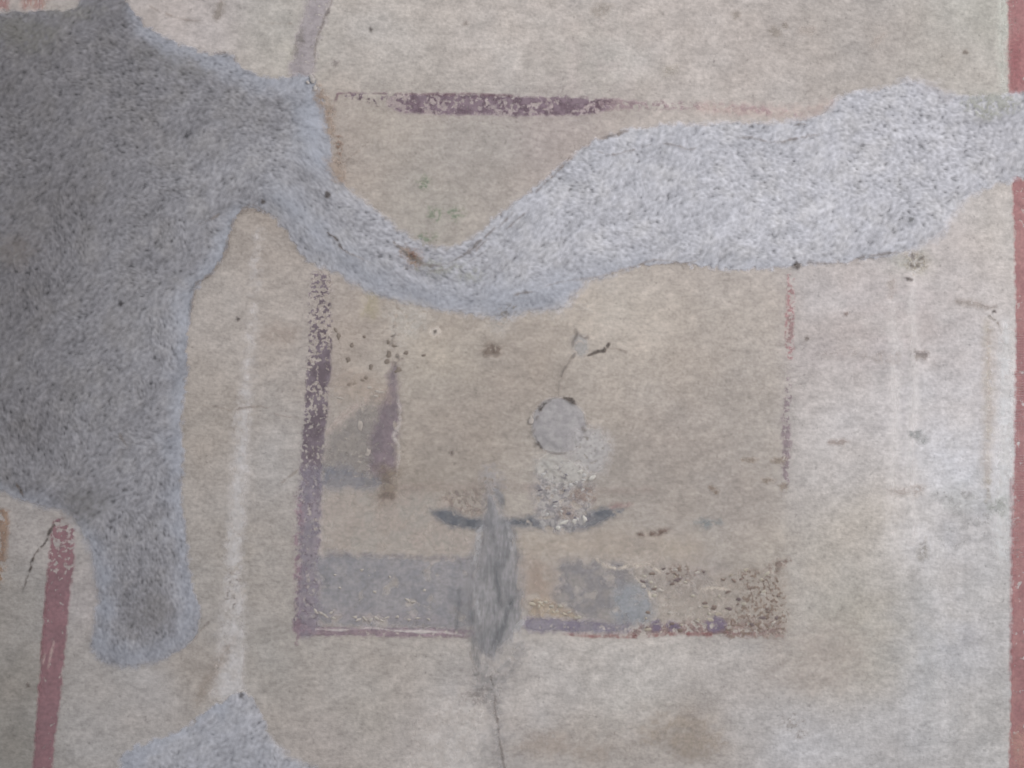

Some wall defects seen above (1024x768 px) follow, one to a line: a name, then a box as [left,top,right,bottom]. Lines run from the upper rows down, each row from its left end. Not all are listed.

peeling [347,340,408,398]
flaking render [536,457,596,531]
crack [29,524,55,571]
peeling [610,565,705,632]
peeling [690,568,787,636]